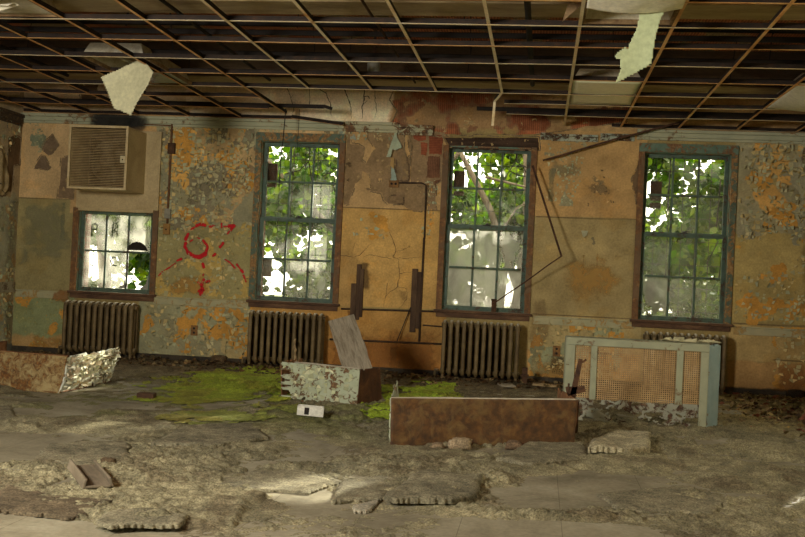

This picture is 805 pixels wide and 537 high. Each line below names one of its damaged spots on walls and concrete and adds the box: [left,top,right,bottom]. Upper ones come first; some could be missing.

spalling [0,120,75,282]
spalling [324,91,629,240]
peeling [140,117,280,359]
crack [340,234,419,306]
peeling [0,292,65,347]
peeling [64,347,121,390]
peeling [528,320,624,380]